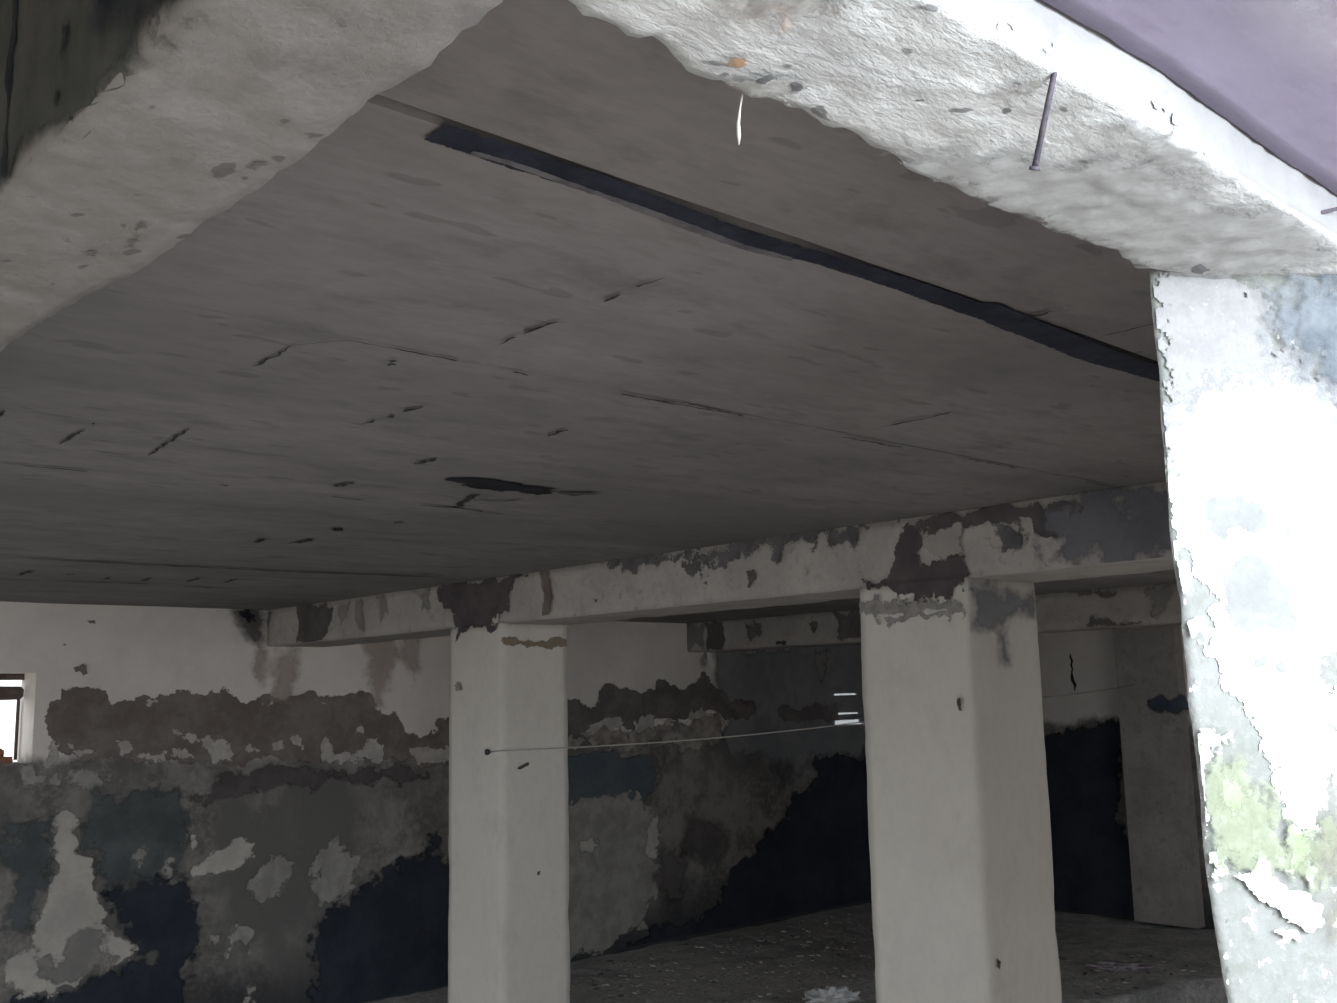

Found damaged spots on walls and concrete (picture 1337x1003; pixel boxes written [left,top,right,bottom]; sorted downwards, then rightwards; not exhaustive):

damp [0,0,209,183]
peeling [436,574,567,650]
peeling [859,501,1082,629]
peeling [1153,271,1337,830]
peeling [0,664,449,792]
peeling [567,672,756,755]
peeling [778,702,840,723]
peeling [4,810,139,999]
peeling [209,924,255,959]
peeling [190,834,361,908]
peeling [568,789,661,961]
peeling [1209,848,1325,942]